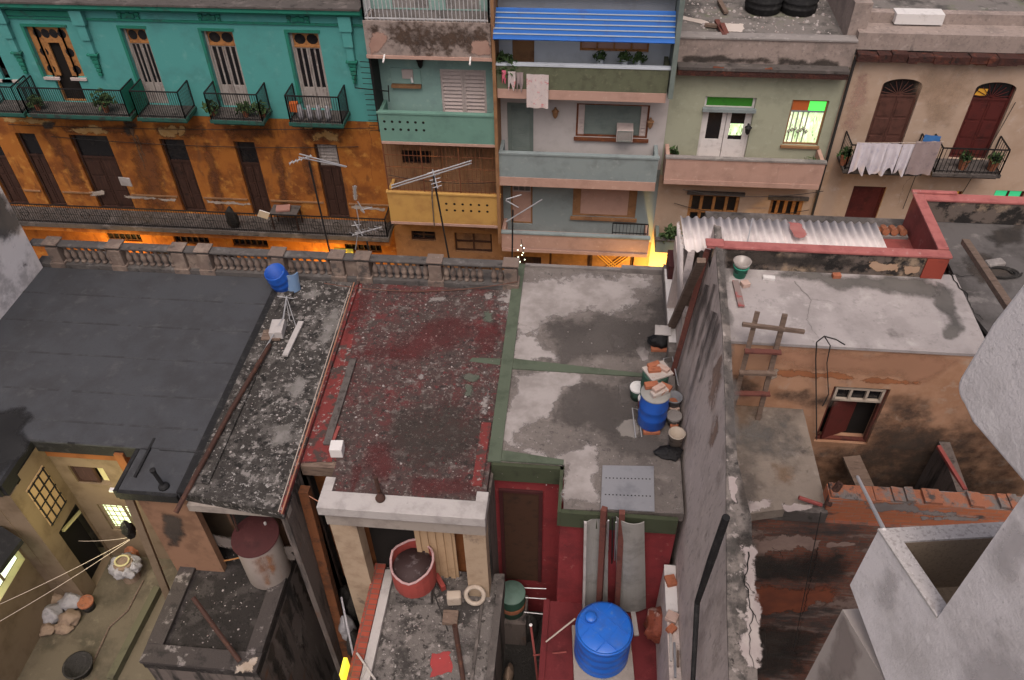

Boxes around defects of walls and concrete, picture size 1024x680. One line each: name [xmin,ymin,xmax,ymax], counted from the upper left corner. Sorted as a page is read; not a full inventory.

damp [371,22,488,56]
damp [549,297,667,364]
damp [829,404,1016,494]
damp [740,474,756,509]
spalling [864,502,979,521]
damp [738,529,845,582]
damp [757,626,822,674]
damp [820,619,857,680]